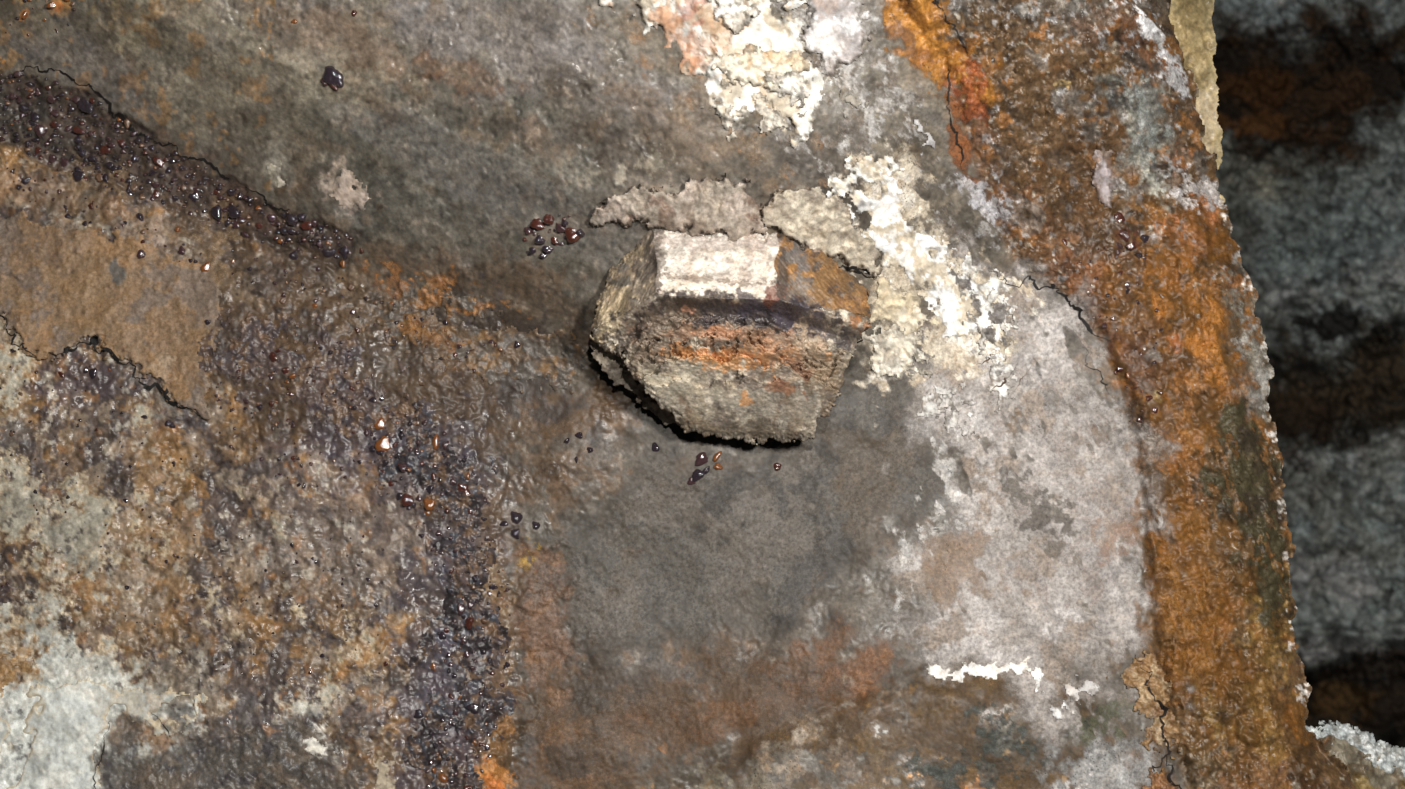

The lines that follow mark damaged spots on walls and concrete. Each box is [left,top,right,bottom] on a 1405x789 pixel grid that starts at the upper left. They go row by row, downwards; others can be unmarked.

corrosion [5,0,76,50]
corrosion [320,66,344,91]
corrosion [882,0,1002,184]
damp [1105,0,1195,163]
corrosion [1212,3,1405,175]
damp [1168,164,1227,214]
corrosion [0,70,1084,789]
damp [528,0,1178,789]
corrosion [1062,207,1405,704]
corrosion [1285,640,1405,766]